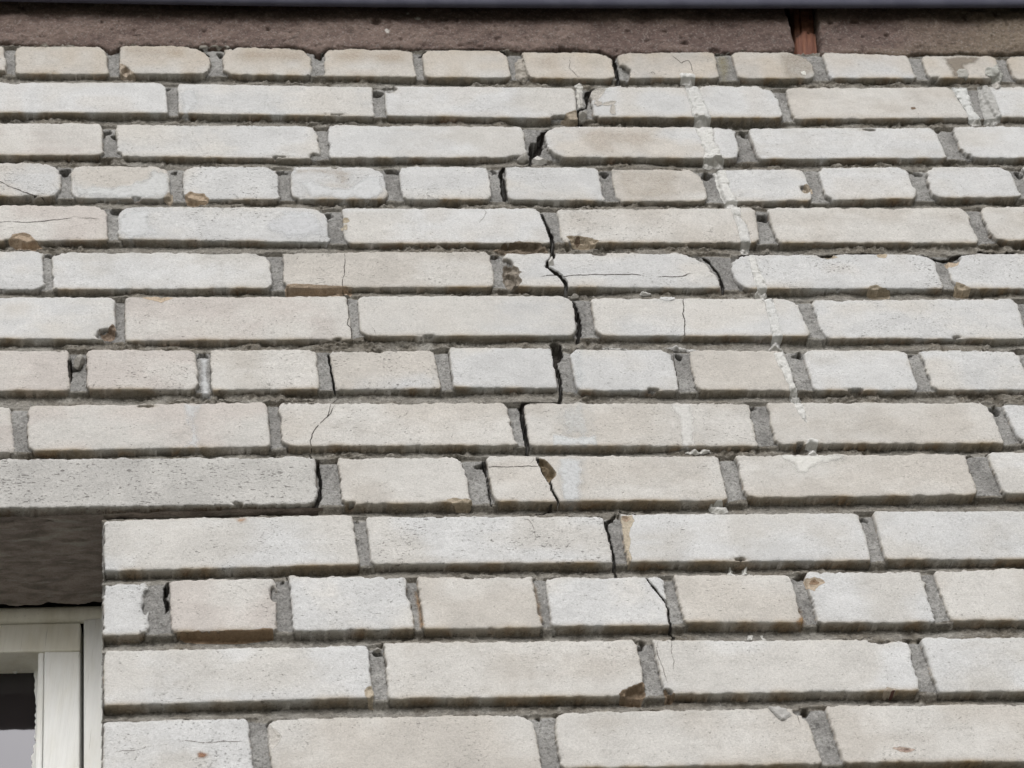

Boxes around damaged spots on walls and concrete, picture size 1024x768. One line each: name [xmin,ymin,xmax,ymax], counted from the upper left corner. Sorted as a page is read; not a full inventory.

crack [569,52,620,127]
crack [479,130,549,223]
damp [680,73,807,422]
crack [541,215,724,404]
crack [484,403,560,533]
spalling [539,458,556,483]
crack [604,513,636,578]
crack [645,578,675,680]
spalling [619,682,646,708]